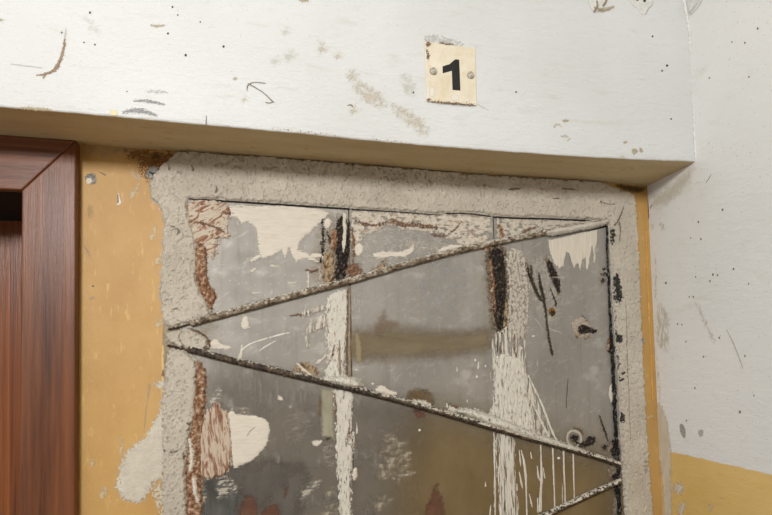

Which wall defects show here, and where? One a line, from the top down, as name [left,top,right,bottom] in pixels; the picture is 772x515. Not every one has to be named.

spalling [161,323,177,395]
corrosion [185,361,232,515]
corrosion [186,200,235,313]
peeling [289,304,327,348]
spalling [189,217,607,326]
spalling [187,345,621,468]
water stain [202,212,614,515]
spalling [539,478,625,515]